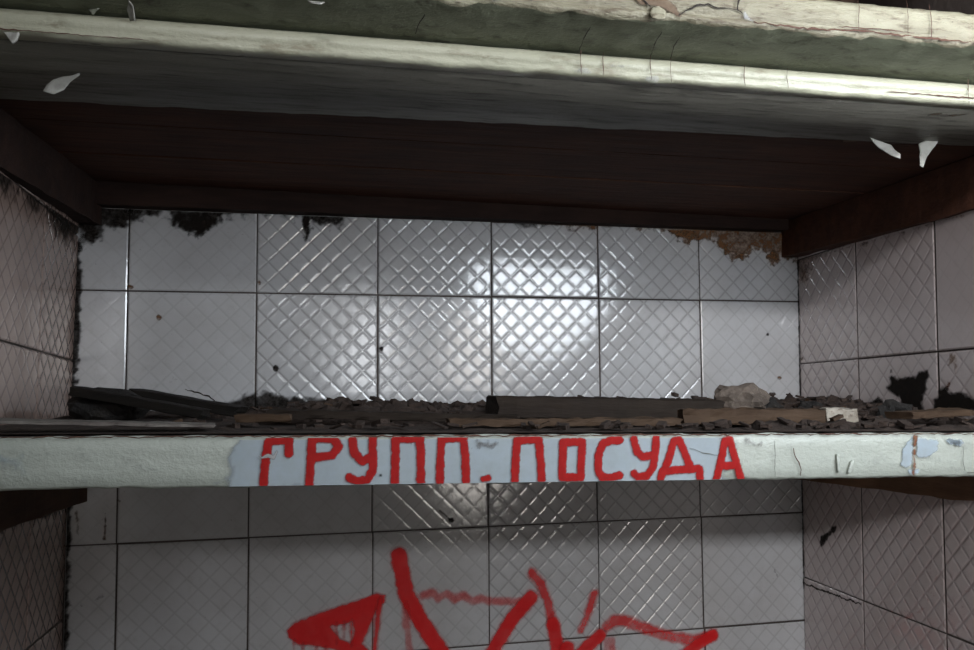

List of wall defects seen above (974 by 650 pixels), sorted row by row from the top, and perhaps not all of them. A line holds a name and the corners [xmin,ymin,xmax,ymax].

crack [650,0,971,83]
peeling [43,73,80,94]
peeling [870,137,938,168]